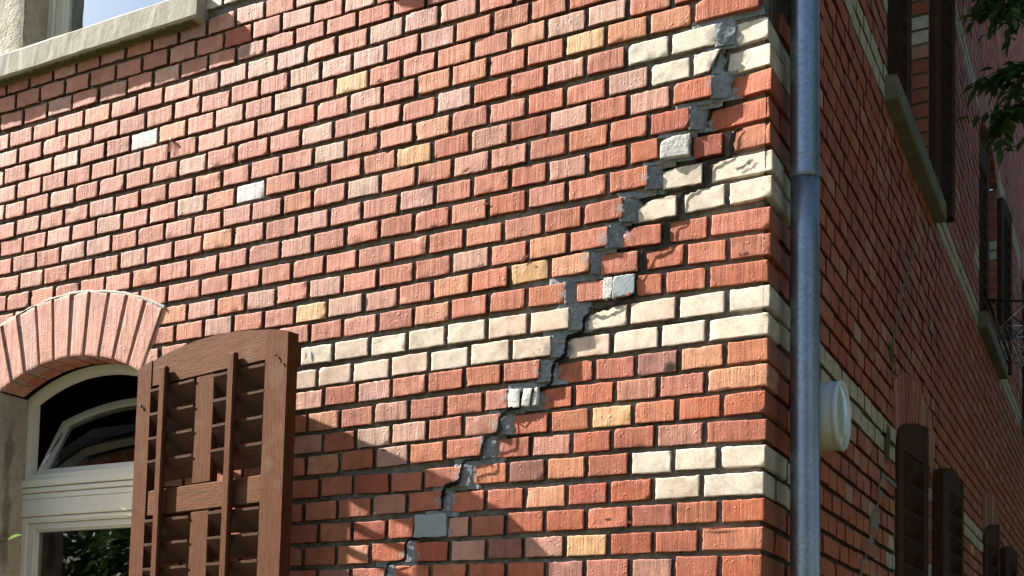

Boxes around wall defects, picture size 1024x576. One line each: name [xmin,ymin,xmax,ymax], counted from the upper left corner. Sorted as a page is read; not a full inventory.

crack [376,6,766,576]